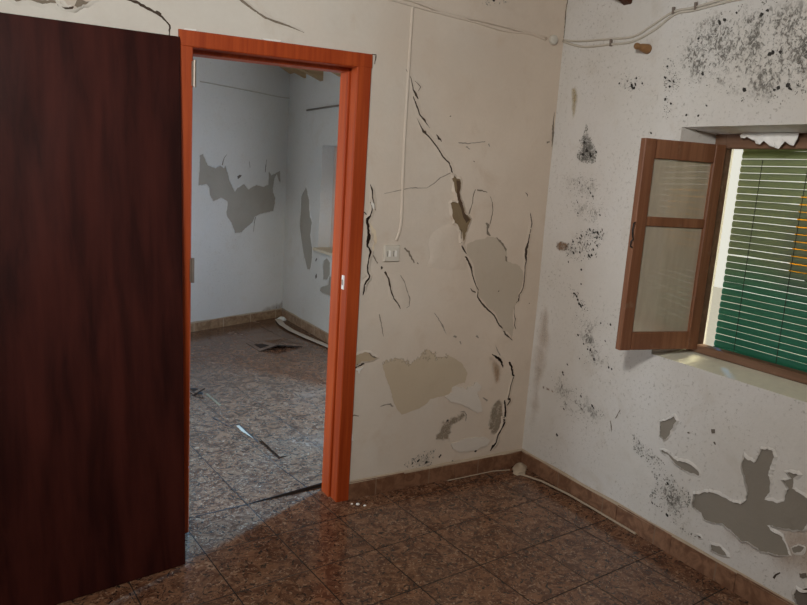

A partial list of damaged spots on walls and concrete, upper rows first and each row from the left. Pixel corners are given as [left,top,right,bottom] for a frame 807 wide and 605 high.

crack [128,0,171,35]
crack [235,0,304,36]
damp [663,0,807,118]
mould [577,126,597,164]
peeling [197,153,281,234]
crack [360,68,490,337]
peeling [448,172,472,246]
damp [556,178,606,271]
crack [457,189,535,452]
mould [632,435,690,523]
peeling [659,413,701,478]
peeling [691,446,807,558]